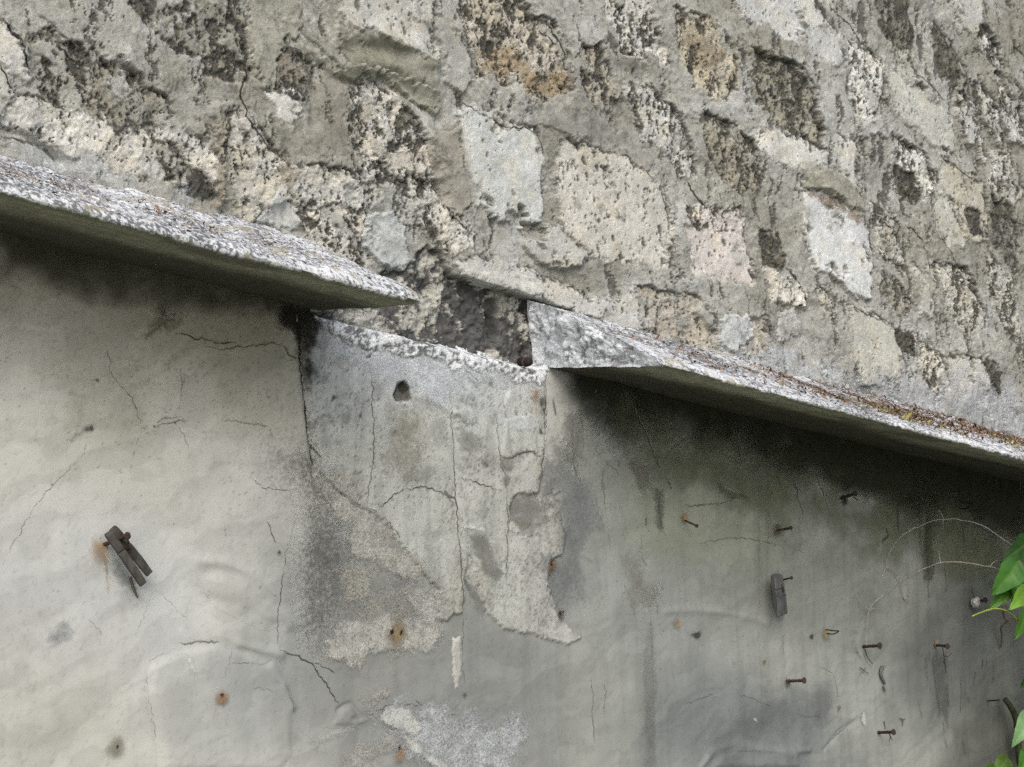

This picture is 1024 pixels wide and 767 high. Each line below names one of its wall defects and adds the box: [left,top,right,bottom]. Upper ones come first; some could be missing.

crack [160,640,295,710]
crack [181,331,321,462]
crack [268,523,338,702]
rust [388,621,405,644]
crack [331,371,547,643]
peeling [301,320,582,767]
water stain [509,374,1024,596]